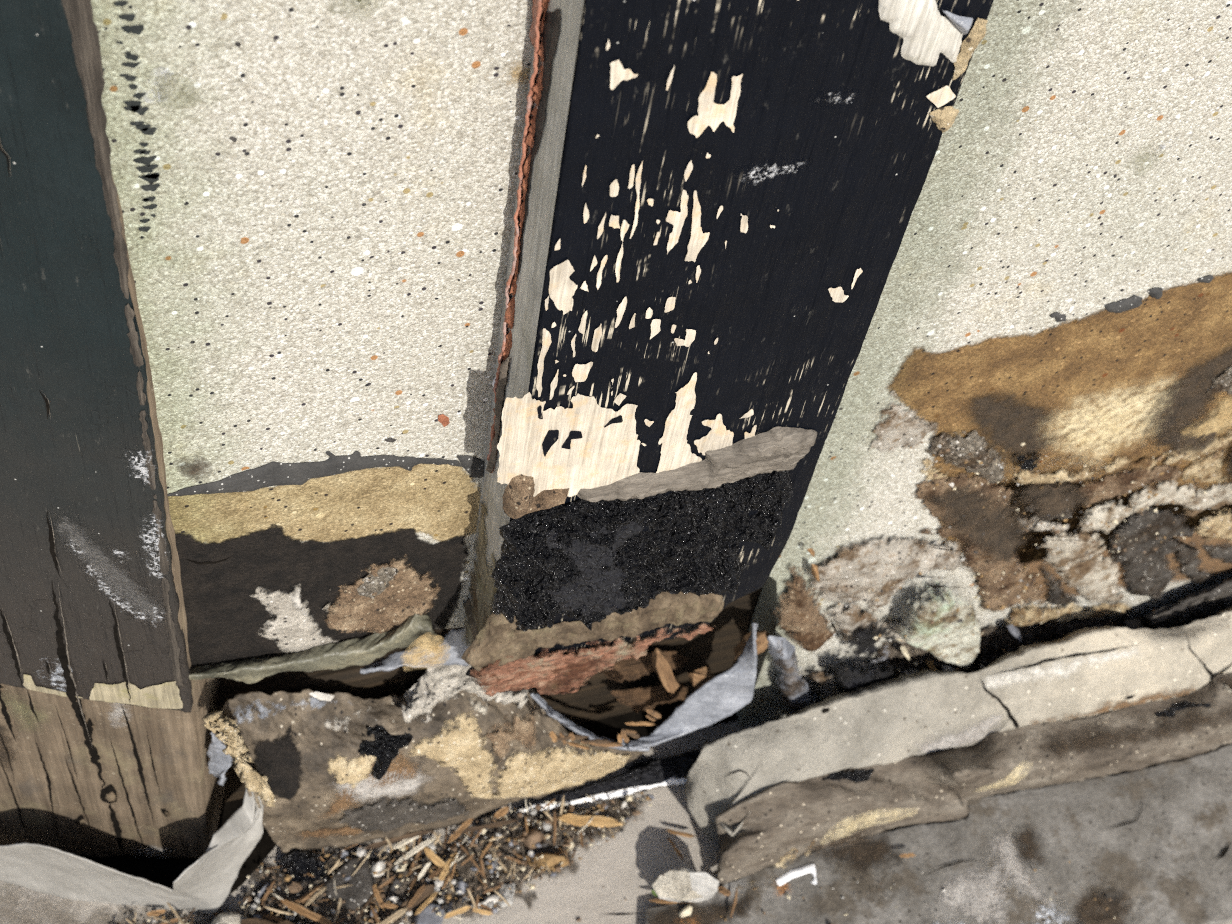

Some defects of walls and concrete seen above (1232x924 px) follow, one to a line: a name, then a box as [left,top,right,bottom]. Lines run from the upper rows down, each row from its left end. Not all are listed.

peeling [606,39,638,90]
peeling [688,72,743,138]
peeling [491,161,757,497]
leakage [887,272,1232,564]
spalling [1013,430,1232,603]
crack [903,585,965,607]
crack [0,511,160,857]
crack [981,644,1139,728]
crack [1186,634,1228,686]
leakage [920,716,1001,754]
leakage [647,899,751,924]
leakage [940,829,1051,924]